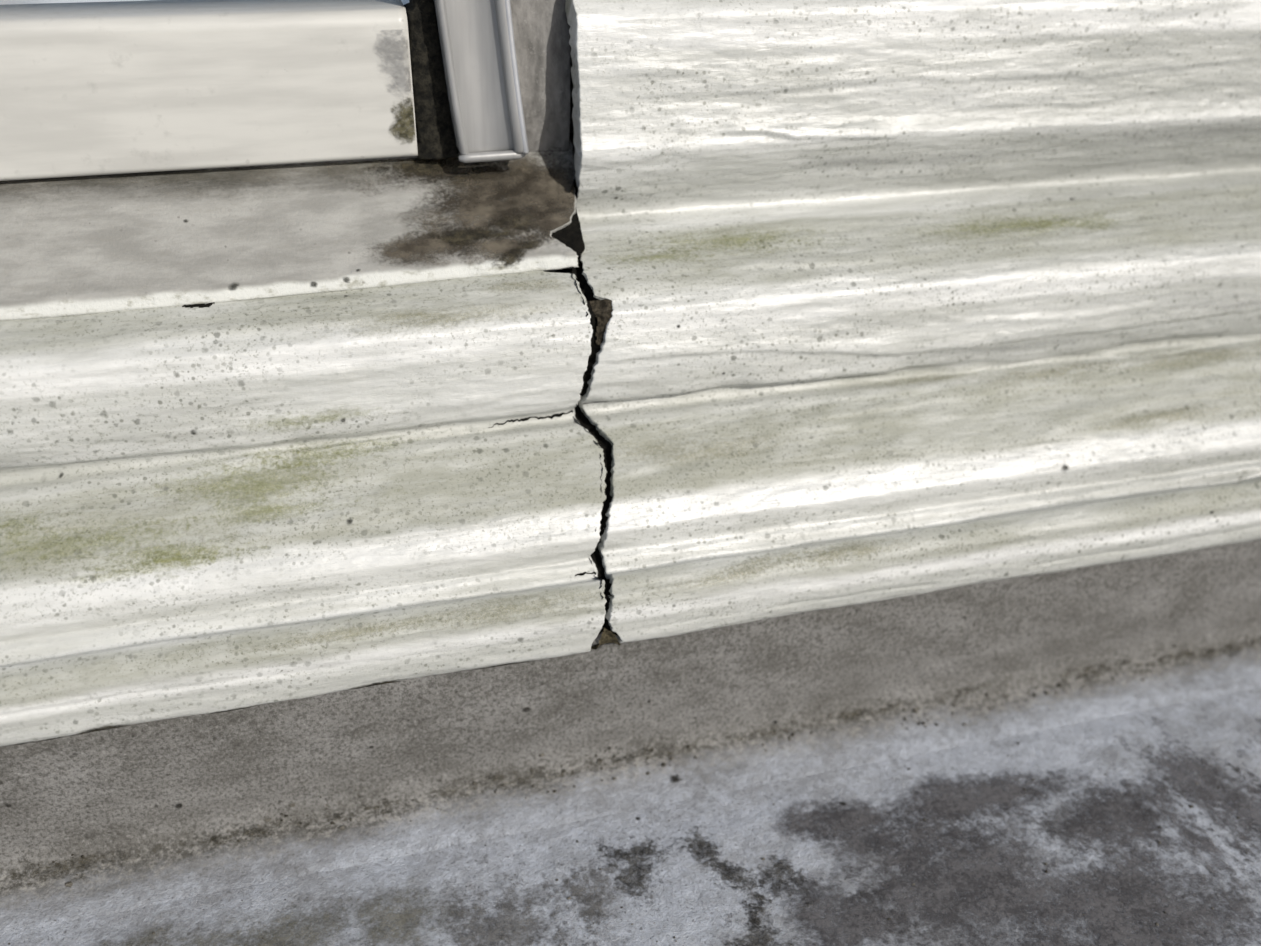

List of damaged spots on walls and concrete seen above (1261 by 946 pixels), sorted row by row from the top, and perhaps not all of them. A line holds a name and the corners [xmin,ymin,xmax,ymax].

water stain [368,158,526,188]
water stain [431,215,538,246]
crack [488,179,622,636]
water stain [1121,741,1261,901]
water stain [189,906,344,946]
water stain [358,891,427,943]
water stain [442,864,633,946]